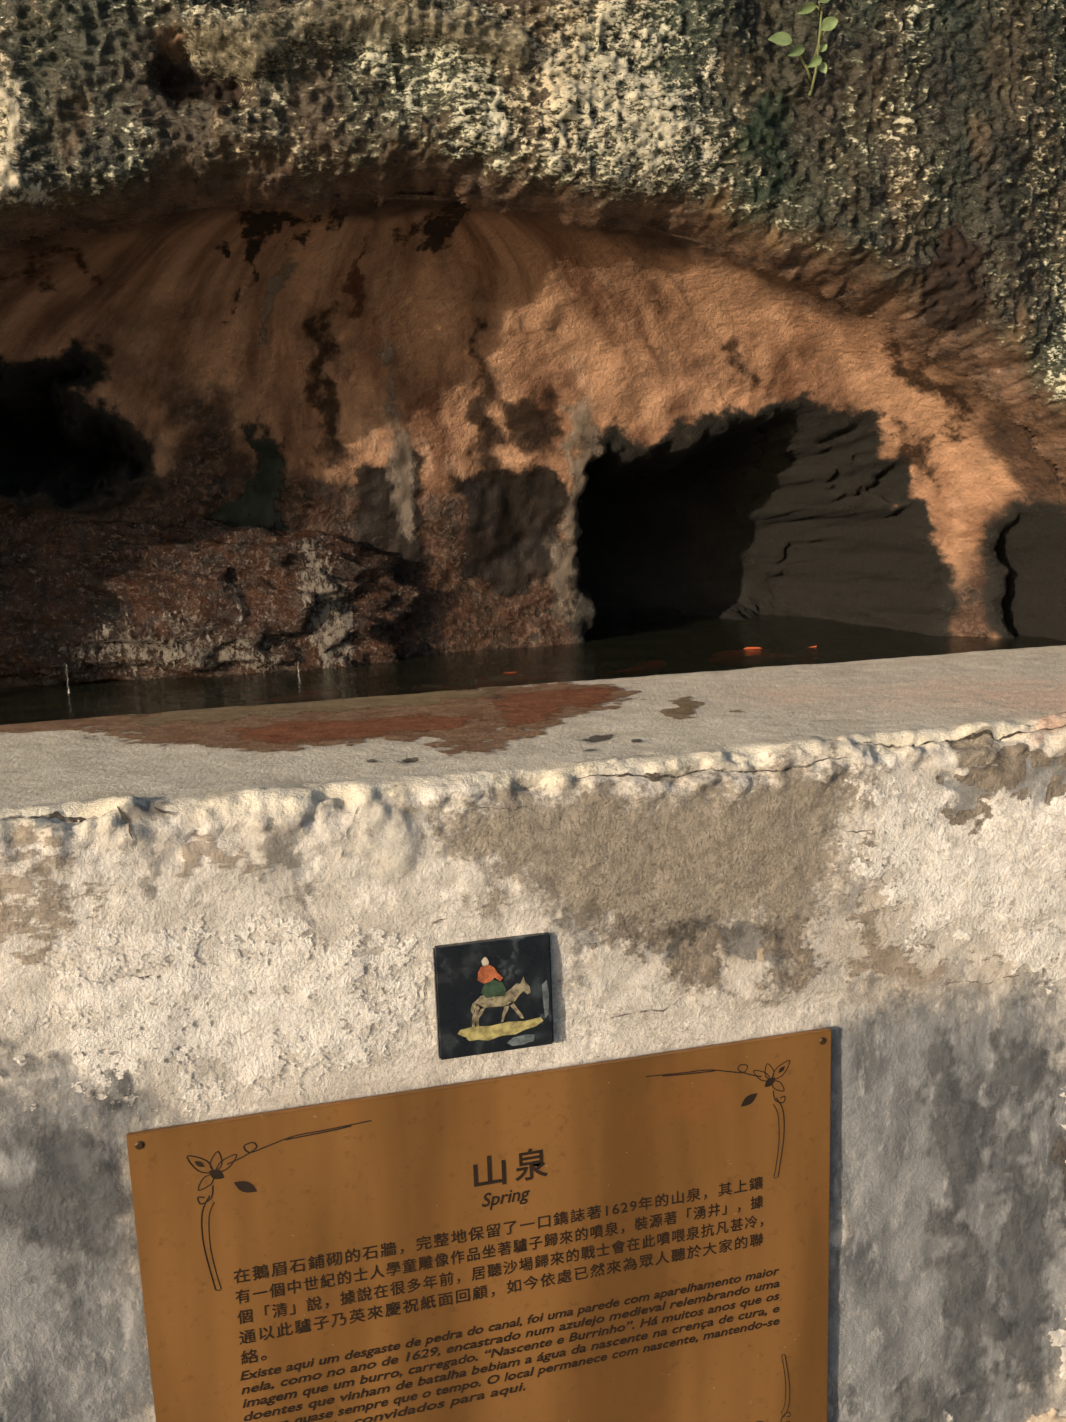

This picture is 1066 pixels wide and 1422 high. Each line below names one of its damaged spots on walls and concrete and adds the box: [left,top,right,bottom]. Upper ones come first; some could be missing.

rust [0,682,645,756]
rust [660,696,704,719]
crack [576,725,1066,782]
crack [4,806,174,839]
spalling [393,726,1066,1006]
leakage [0,1042,154,1422]
leakage [822,989,1066,1422]
peeling [1047,1294,1066,1384]
peeling [1025,1407,1066,1422]